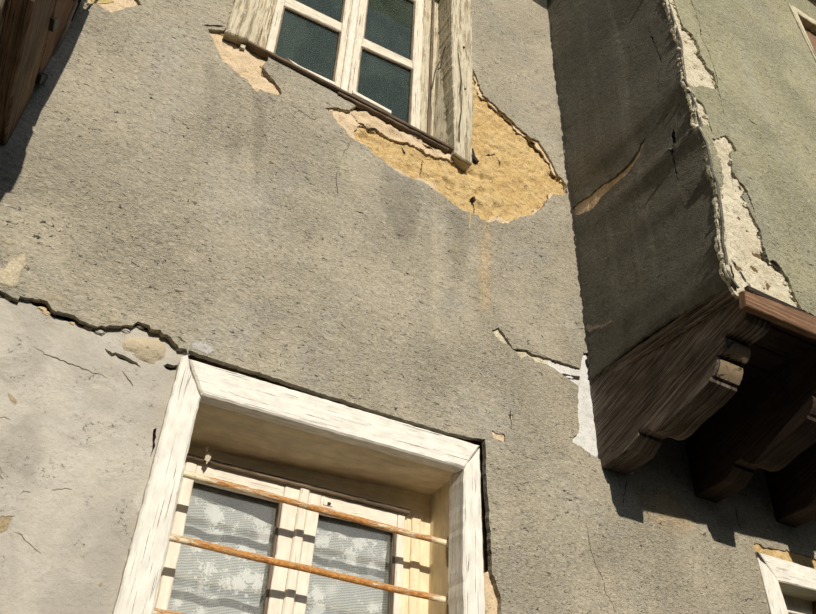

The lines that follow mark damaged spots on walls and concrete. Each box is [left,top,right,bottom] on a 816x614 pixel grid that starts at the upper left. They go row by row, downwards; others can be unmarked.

peeling [81,0,139,12]
peeling [209,32,280,95]
peeling [663,0,715,130]
spalling [328,74,565,224]
peeling [712,137,798,308]
crack [0,295,159,335]
crack [36,348,134,385]
crack [165,347,190,370]